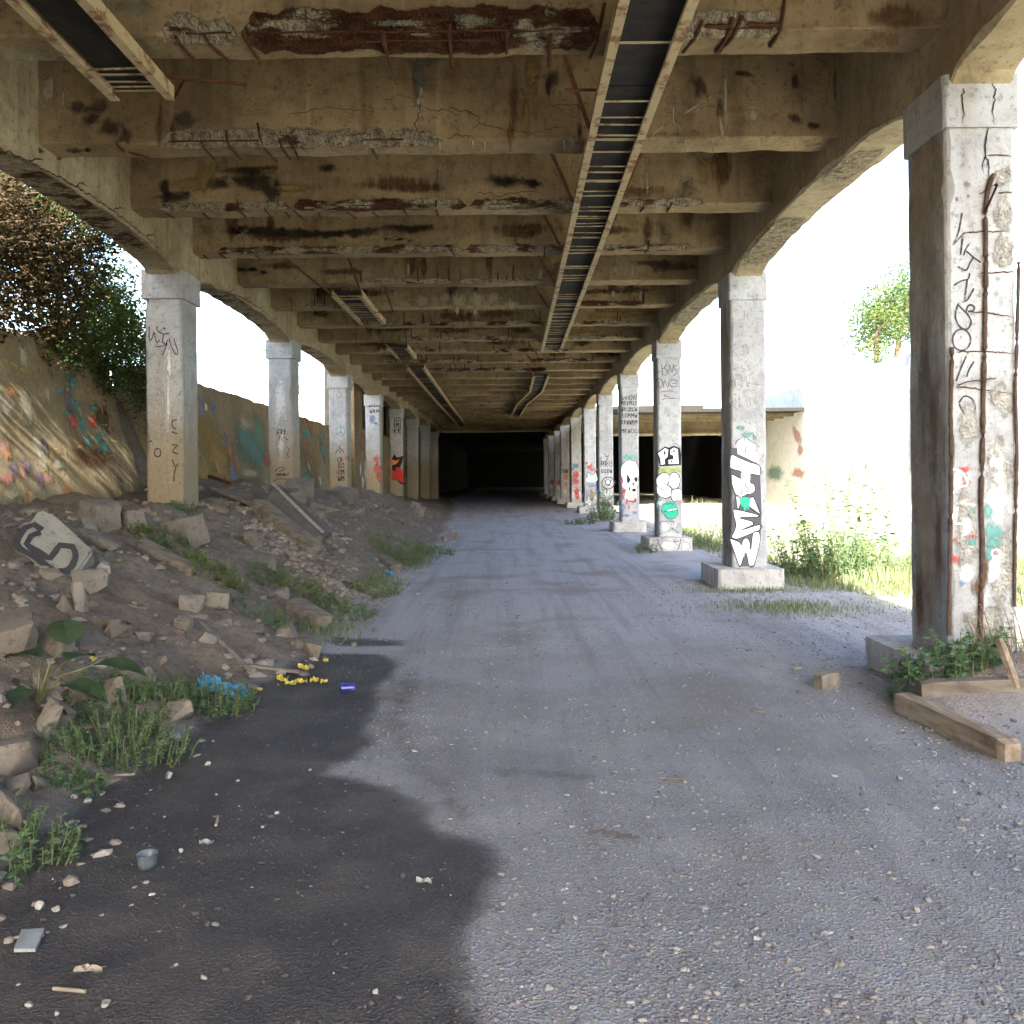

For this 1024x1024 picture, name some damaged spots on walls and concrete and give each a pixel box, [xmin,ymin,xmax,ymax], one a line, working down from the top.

spalling [161,2,607,70]